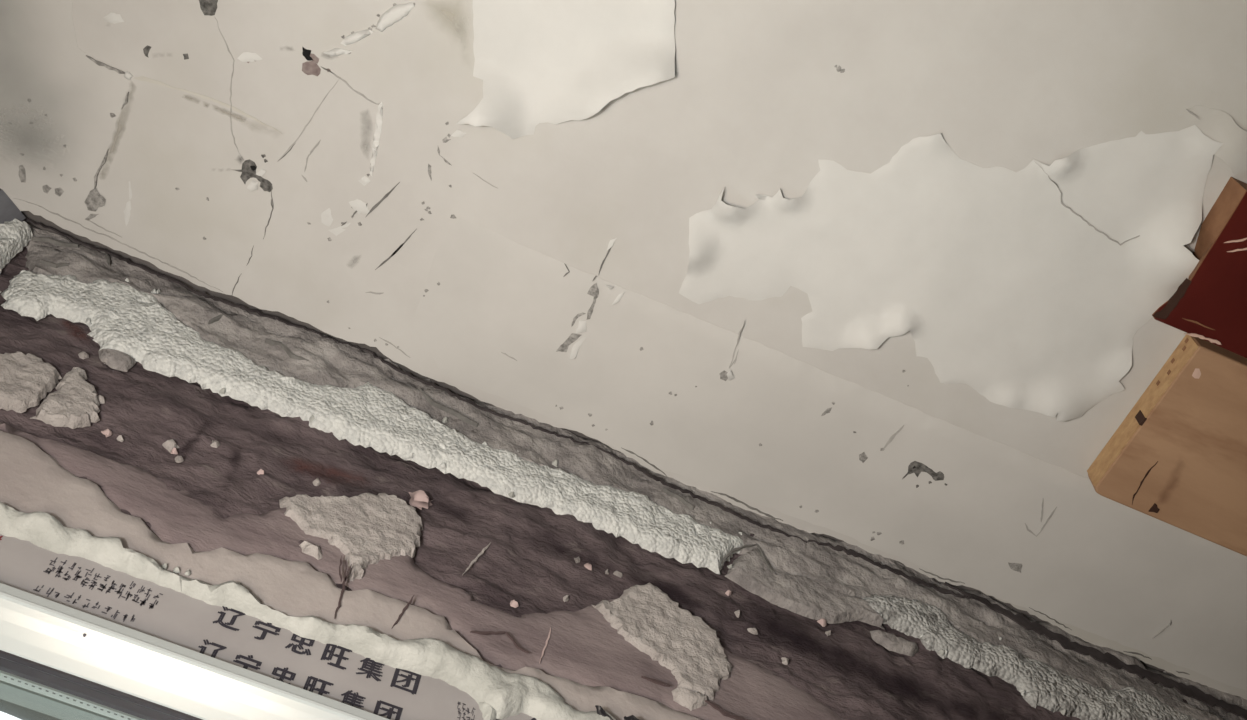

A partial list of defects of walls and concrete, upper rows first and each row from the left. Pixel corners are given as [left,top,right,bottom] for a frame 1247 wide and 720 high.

crack [215,18,243,159]
crack [278,67,383,182]
peeling [428,0,675,181]
crack [341,182,400,226]
peeling [679,125,1223,422]
crack [1034,161,1140,246]
crack [14,191,1247,720]